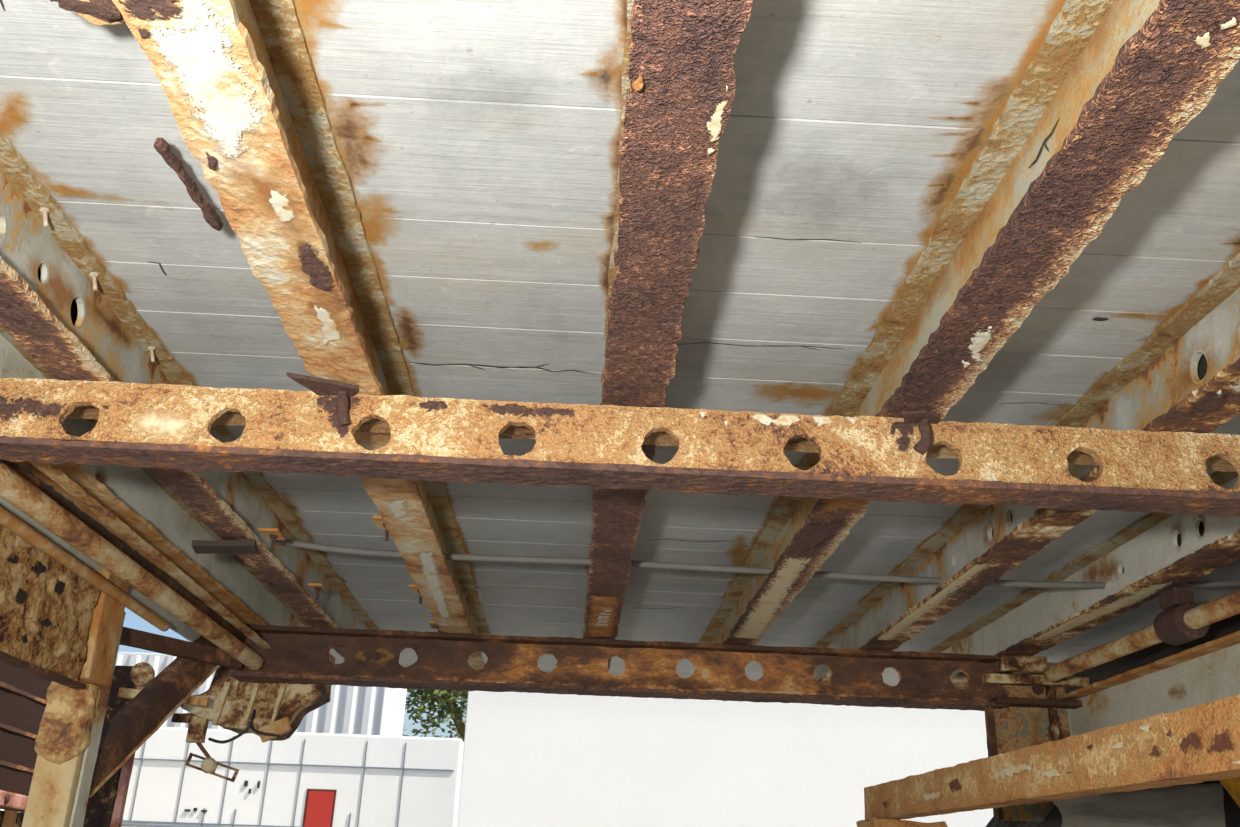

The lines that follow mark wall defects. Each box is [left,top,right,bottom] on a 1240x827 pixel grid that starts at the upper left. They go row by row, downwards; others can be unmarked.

peeling [118,0,267,159]
rust [868,0,1067,346]
rust [231,170,305,247]
peeling [269,188,298,222]
rust [317,80,421,397]
crack [761,236,862,244]
peeling [314,306,341,344]
crack [407,362,590,373]
crack [676,342,841,351]
peeling [962,326,995,369]
rust [316,395,360,438]
rust [890,422,917,452]